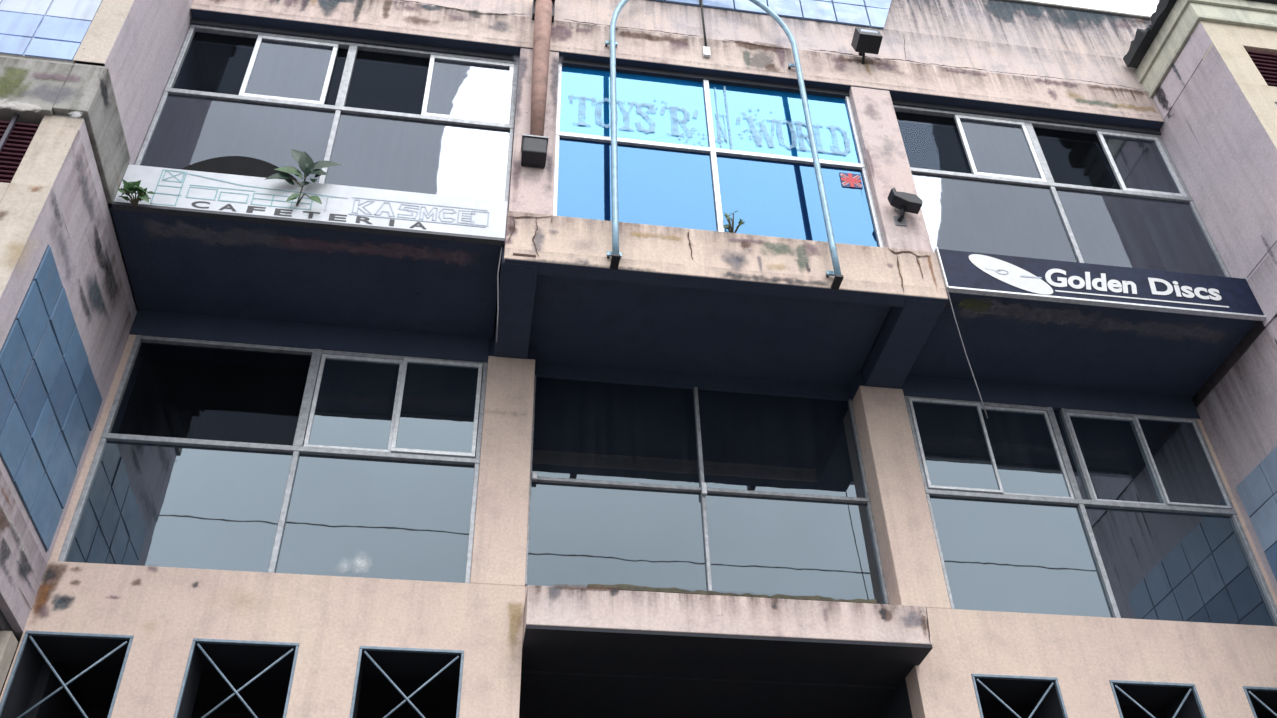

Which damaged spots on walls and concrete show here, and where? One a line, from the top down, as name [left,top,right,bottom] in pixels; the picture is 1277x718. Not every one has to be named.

leakage [270,0,365,21]
leakage [986,0,1144,41]
leakage [0,67,78,100]
leakage [1077,90,1135,107]
crack [507,216,552,256]
leakage [727,238,824,285]
crack [888,248,928,290]
leakage [0,489,74,616]
leakage [551,585,618,597]